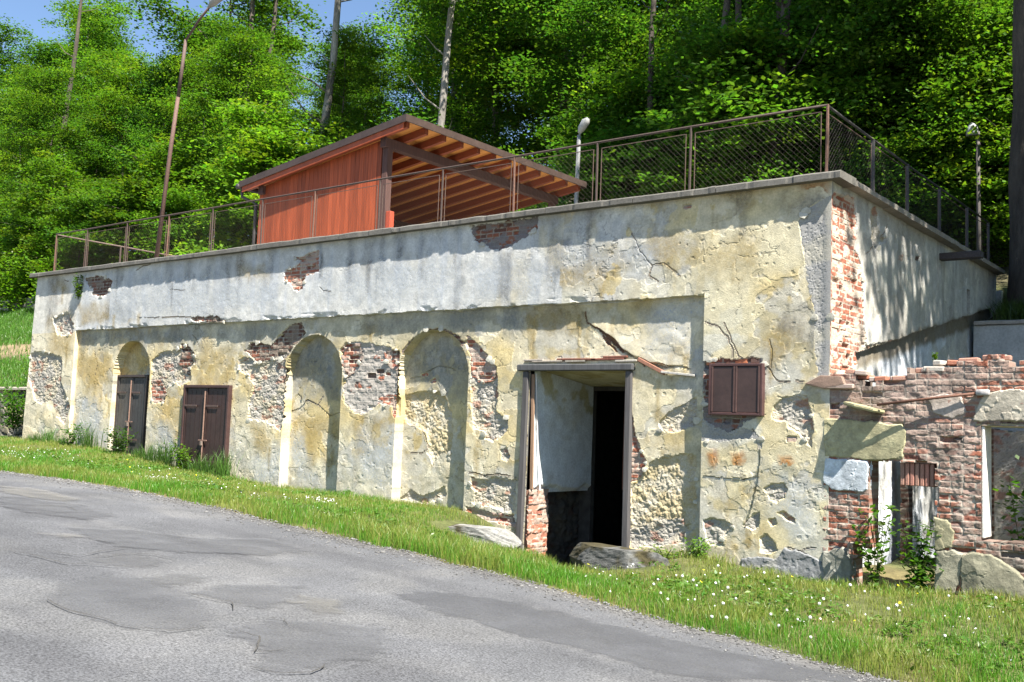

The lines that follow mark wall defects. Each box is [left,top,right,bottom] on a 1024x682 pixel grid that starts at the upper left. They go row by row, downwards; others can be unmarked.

flaking render [86,275,113,299]
flaking render [284,250,320,291]
flaking render [469,216,539,251]
crack [631,233,681,282]
flaking render [798,192,892,376]
flaking render [29,350,70,424]
flaking render [150,344,196,404]
flaking render [237,322,306,430]
flaking render [340,325,510,464]
crack [585,311,645,367]
crack [705,321,804,383]
flaking render [630,418,795,553]